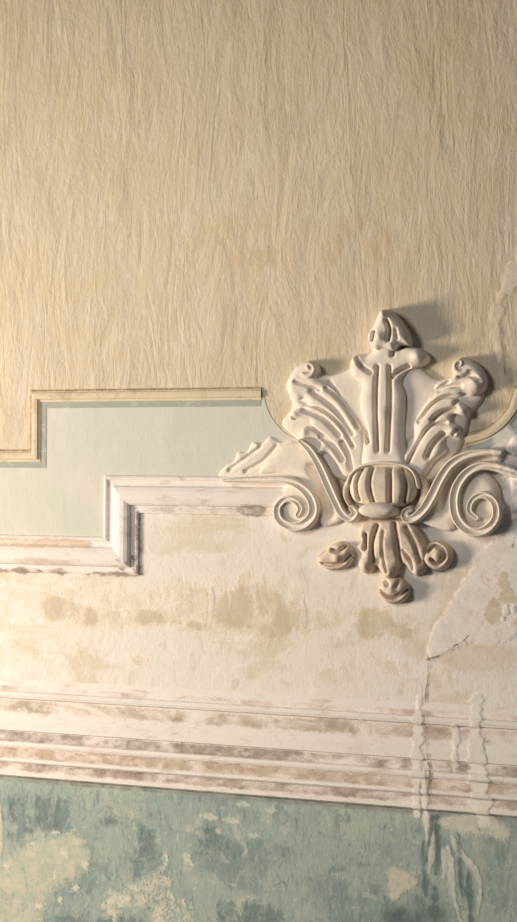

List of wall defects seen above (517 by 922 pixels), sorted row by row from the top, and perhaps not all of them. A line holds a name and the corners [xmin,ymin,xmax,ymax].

crack [423,636,468,865]